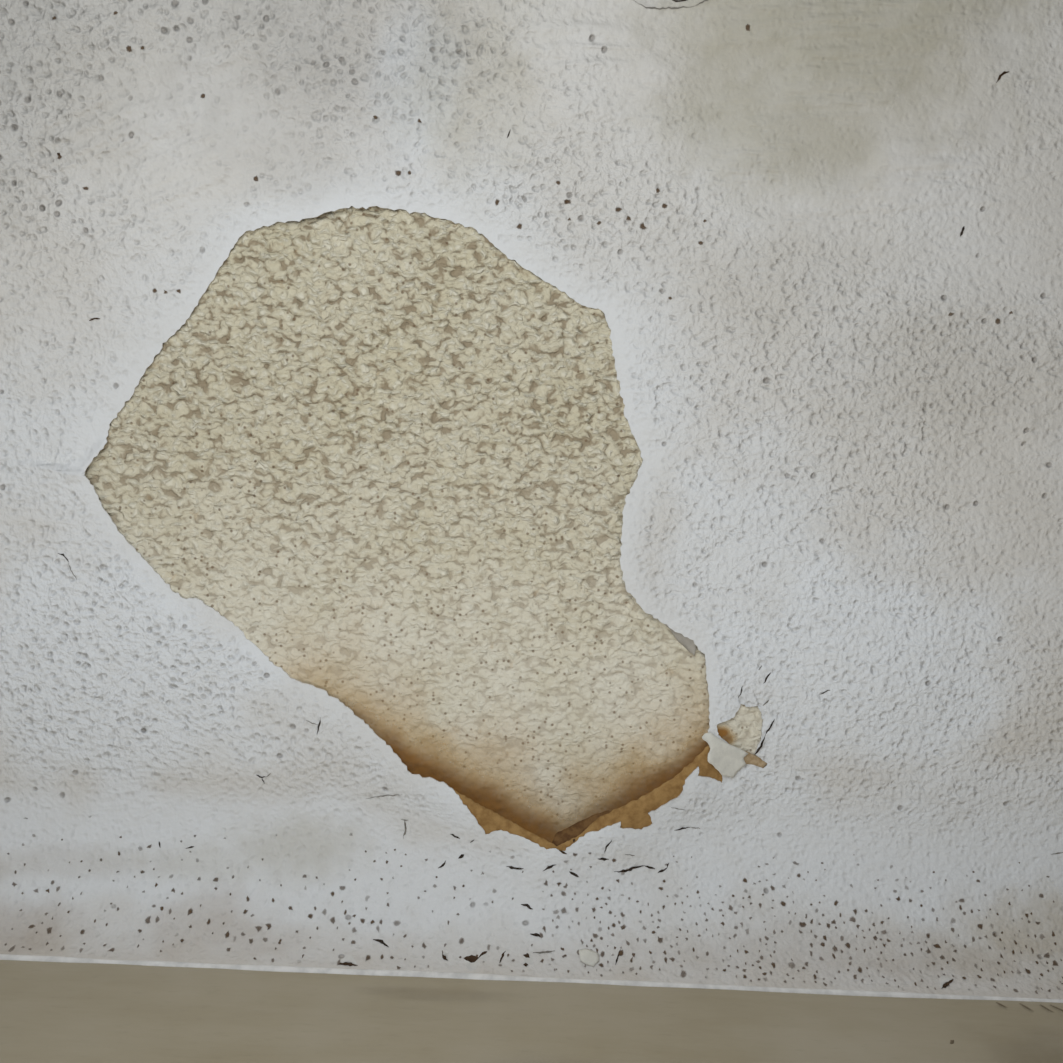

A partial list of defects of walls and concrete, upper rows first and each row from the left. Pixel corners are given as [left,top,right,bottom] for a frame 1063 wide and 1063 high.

peeling [84,206,767,892]